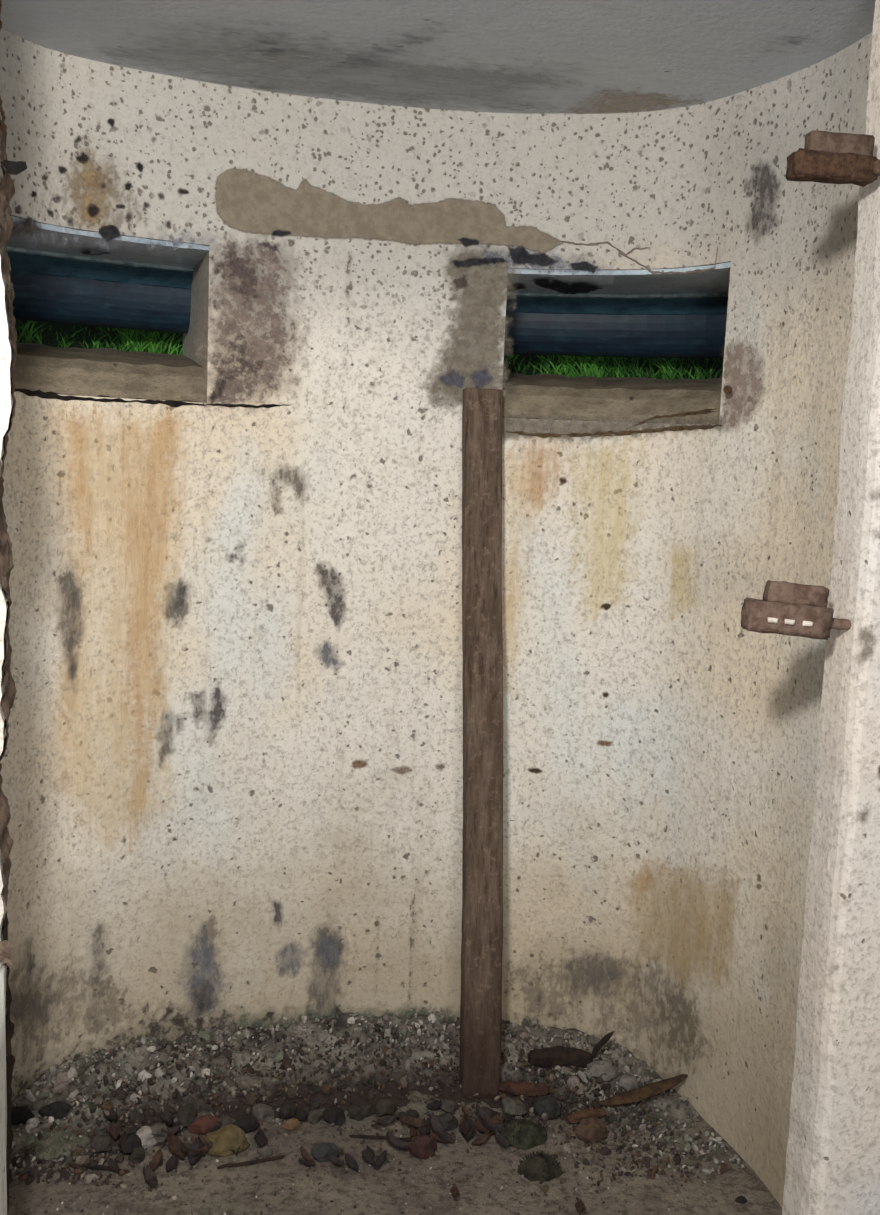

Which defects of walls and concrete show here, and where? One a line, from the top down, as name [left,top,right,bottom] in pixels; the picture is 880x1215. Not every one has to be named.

water stain [574,90,689,114]
water stain [745,165,779,235]
spalling [197,168,602,405]
peeling [723,343,763,427]
water stain [272,469,303,512]
water stain [59,571,82,676]
water stain [166,581,188,623]
water stain [317,565,345,624]
water stain [322,643,337,667]
water stain [192,687,225,730]
water stain [274,902,282,922]
water stain [10,925,344,1102]